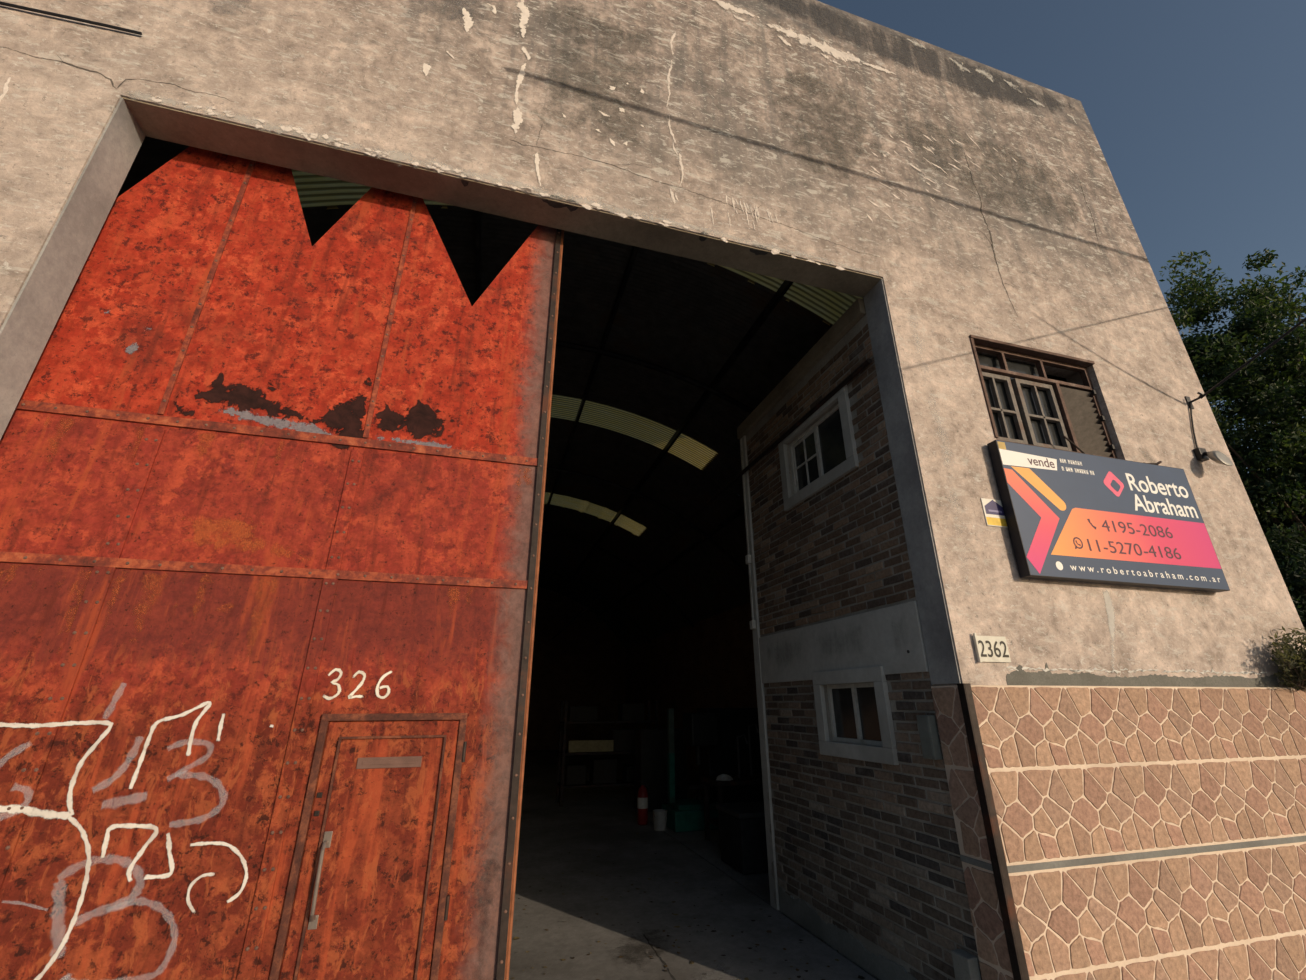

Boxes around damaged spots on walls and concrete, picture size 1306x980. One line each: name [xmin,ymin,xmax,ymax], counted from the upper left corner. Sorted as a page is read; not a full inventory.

crack [3,47,233,102]
peeling [462,8,474,32]
water stain [767,0,1072,110]
corrosion [174,372,455,450]